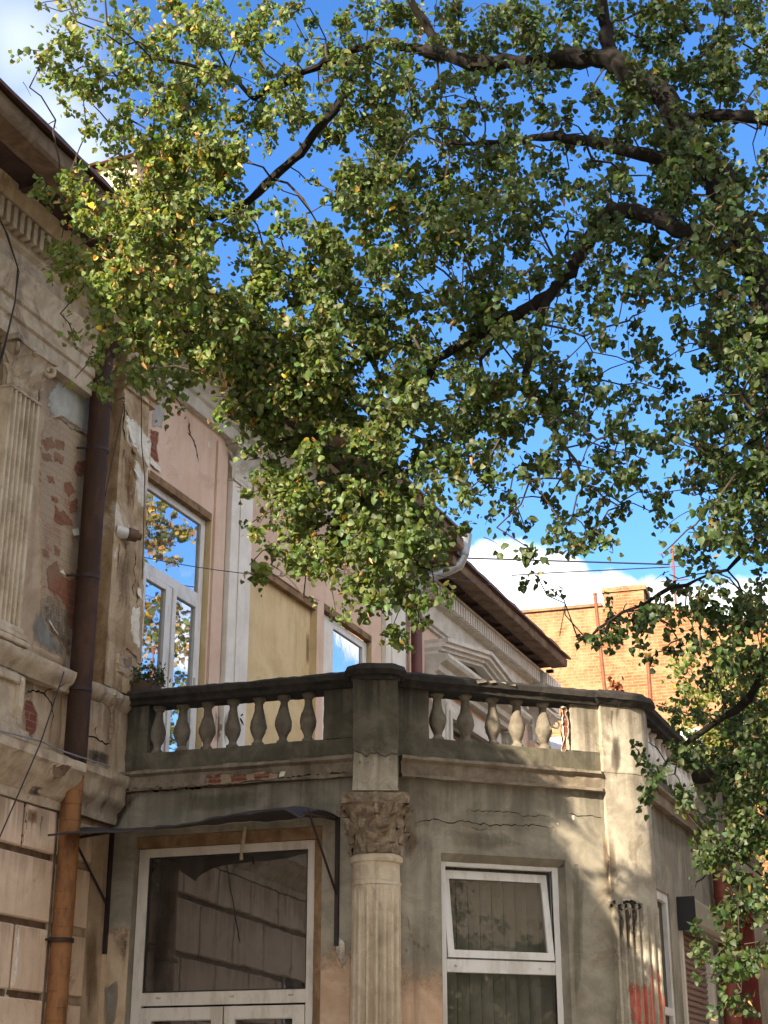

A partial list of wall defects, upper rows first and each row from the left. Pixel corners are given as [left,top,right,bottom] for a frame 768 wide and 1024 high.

spalling [38,415,87,660]
spalling [22,698,38,738]
crack [25,682,68,725]
spalling [204,771,286,788]
crack [415,809,601,833]
water stain [619,907,637,941]